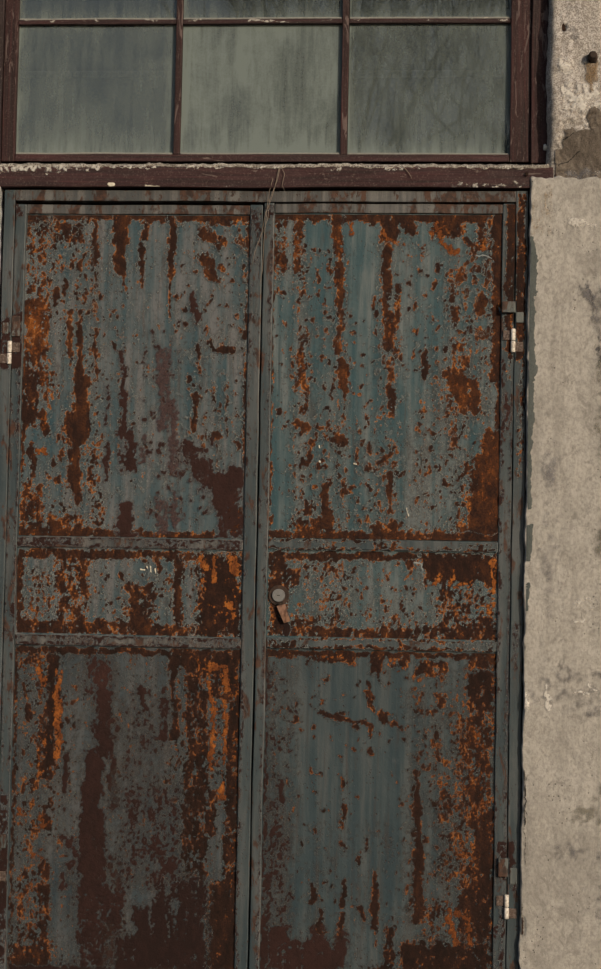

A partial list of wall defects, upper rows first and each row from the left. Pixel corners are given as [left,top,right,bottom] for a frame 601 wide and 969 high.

rust [0,194,527,969]